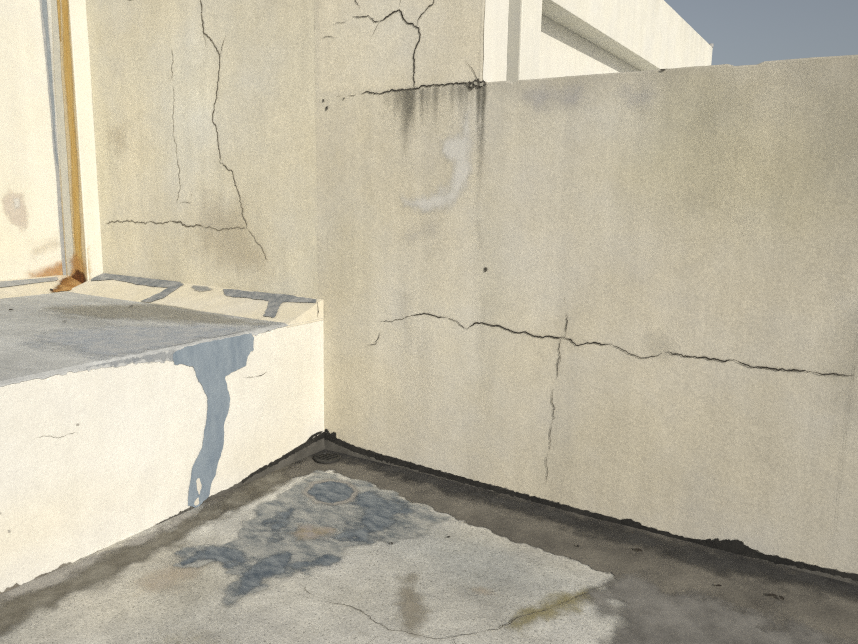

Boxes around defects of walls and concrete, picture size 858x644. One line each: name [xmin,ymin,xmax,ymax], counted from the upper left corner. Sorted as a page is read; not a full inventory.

corrosion [38,0,87,292]
crack [105,0,266,259]
crack [324,0,477,96]
leakage [477,85,486,114]
crack [371,313,855,481]